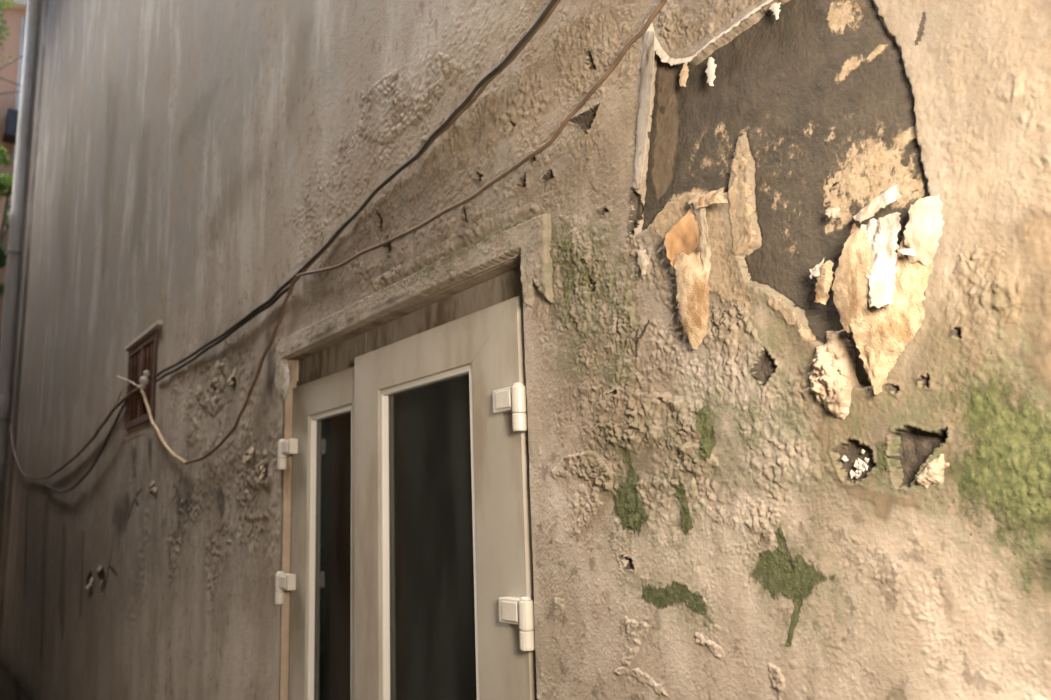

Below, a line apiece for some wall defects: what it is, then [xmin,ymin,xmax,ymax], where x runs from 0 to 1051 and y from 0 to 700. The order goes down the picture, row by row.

spalling [628,0,944,419]
spalling [835,441,876,481]
spalling [888,428,950,489]
spalling [85,565,106,599]